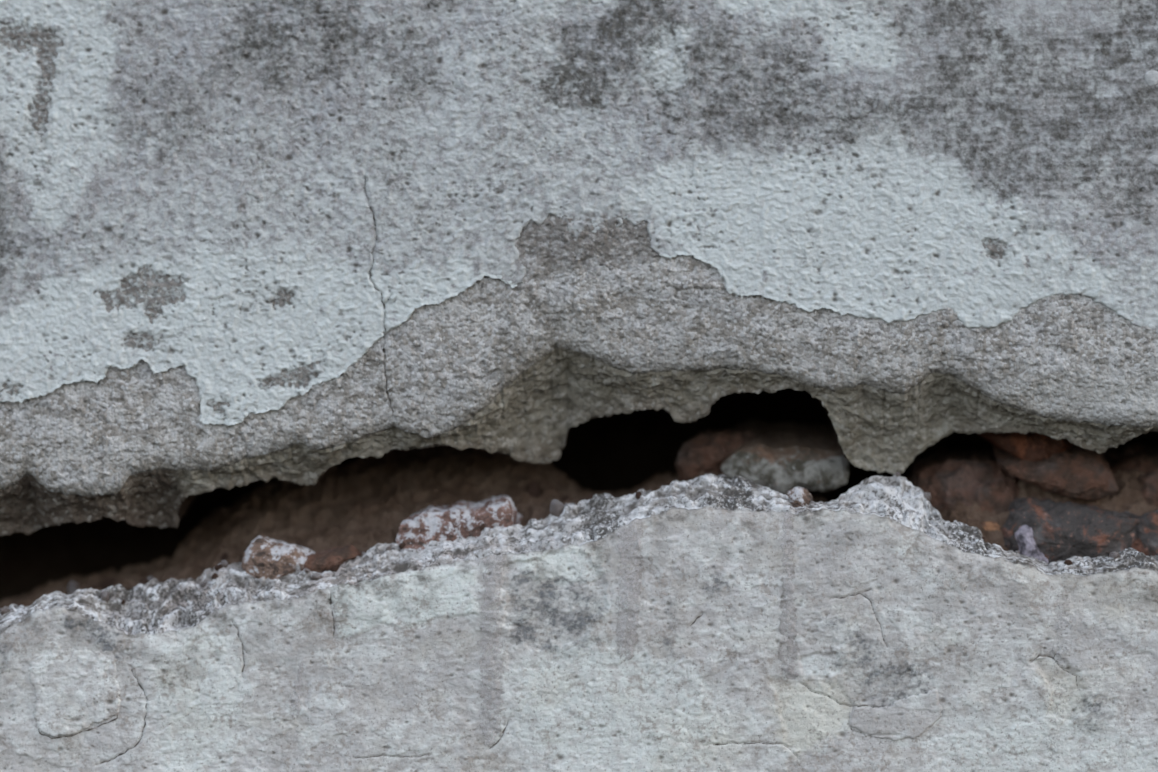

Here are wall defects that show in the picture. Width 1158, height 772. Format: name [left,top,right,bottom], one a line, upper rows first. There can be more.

water stain [221,0,375,90]
water stain [540,0,1158,219]
spalling [0,214,1158,496]
crack [0,178,1158,672]
flaking render [1002,497,1158,563]